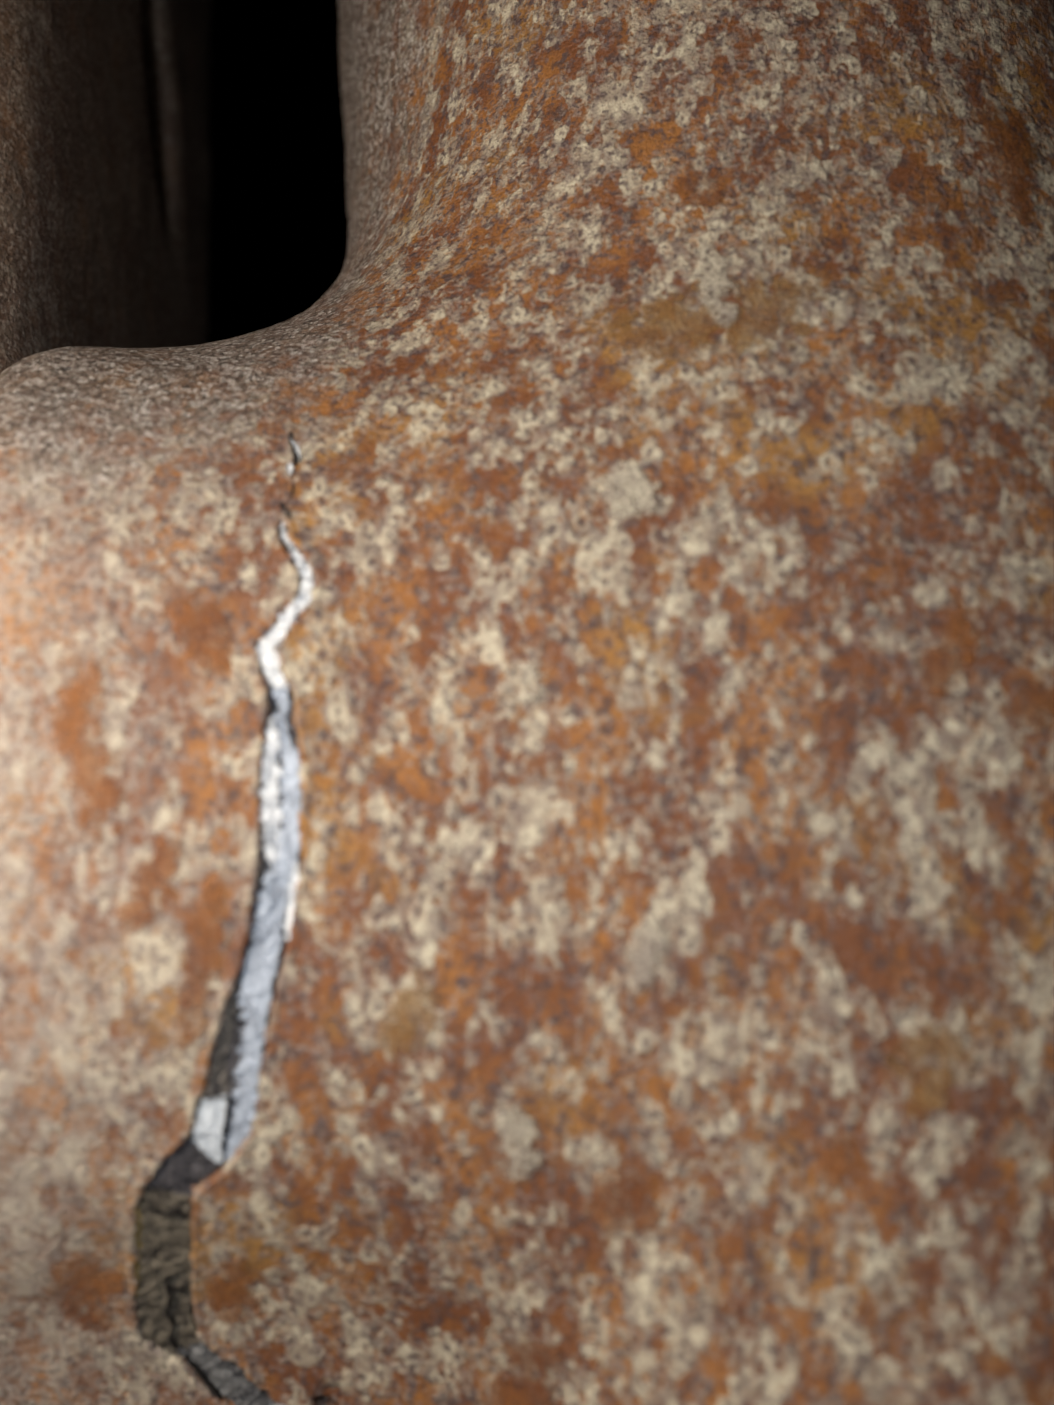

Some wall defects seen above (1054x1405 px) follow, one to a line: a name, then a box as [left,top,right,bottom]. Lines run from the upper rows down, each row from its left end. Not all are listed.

corrosion [670,166,723,205]
corrosion [164,594,230,670]
corrosion [44,656,122,835]
corrosion [118,839,181,933]
corrosion [175,873,225,1047]
crack [134,431,314,1405]
corrosion [207,1260,260,1323]
corrosion [478,1340,561,1405]